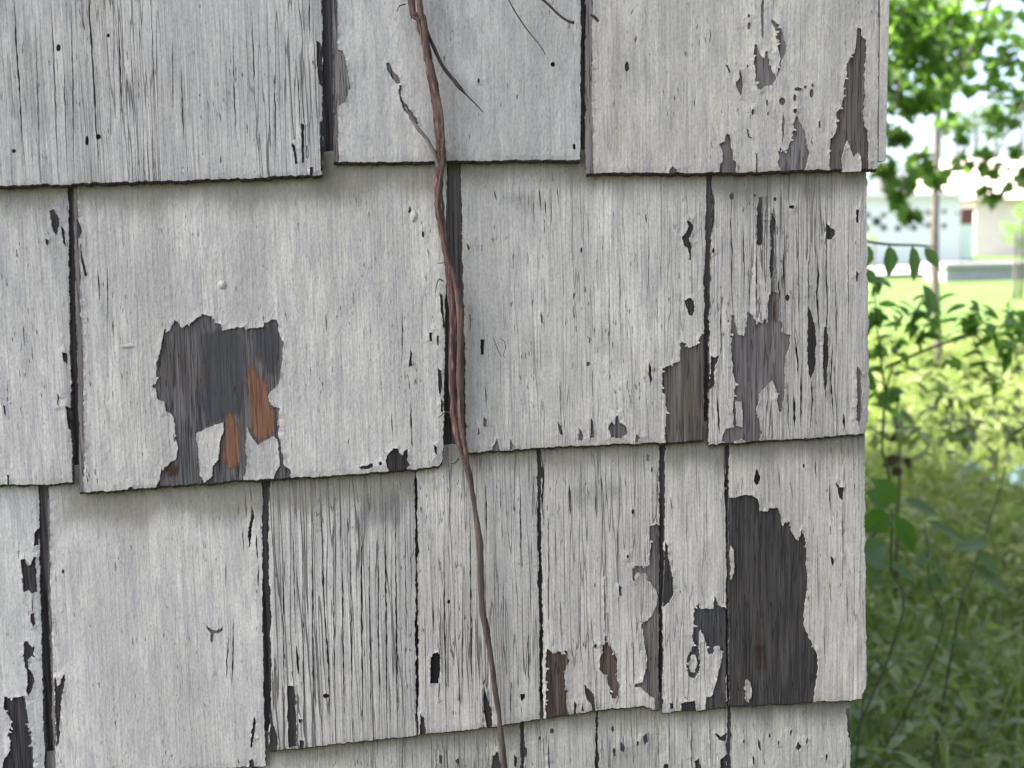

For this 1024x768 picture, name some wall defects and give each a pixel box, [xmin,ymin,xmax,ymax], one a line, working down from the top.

peeling [719,134,737,173]
peeling [725,0,813,171]
peeling [829,28,869,172]
peeling [649,194,791,443]
peeling [151,314,291,487]
peeling [3,641,35,768]
peeling [539,649,595,768]
peeling [594,636,620,700]
peeling [627,495,818,710]